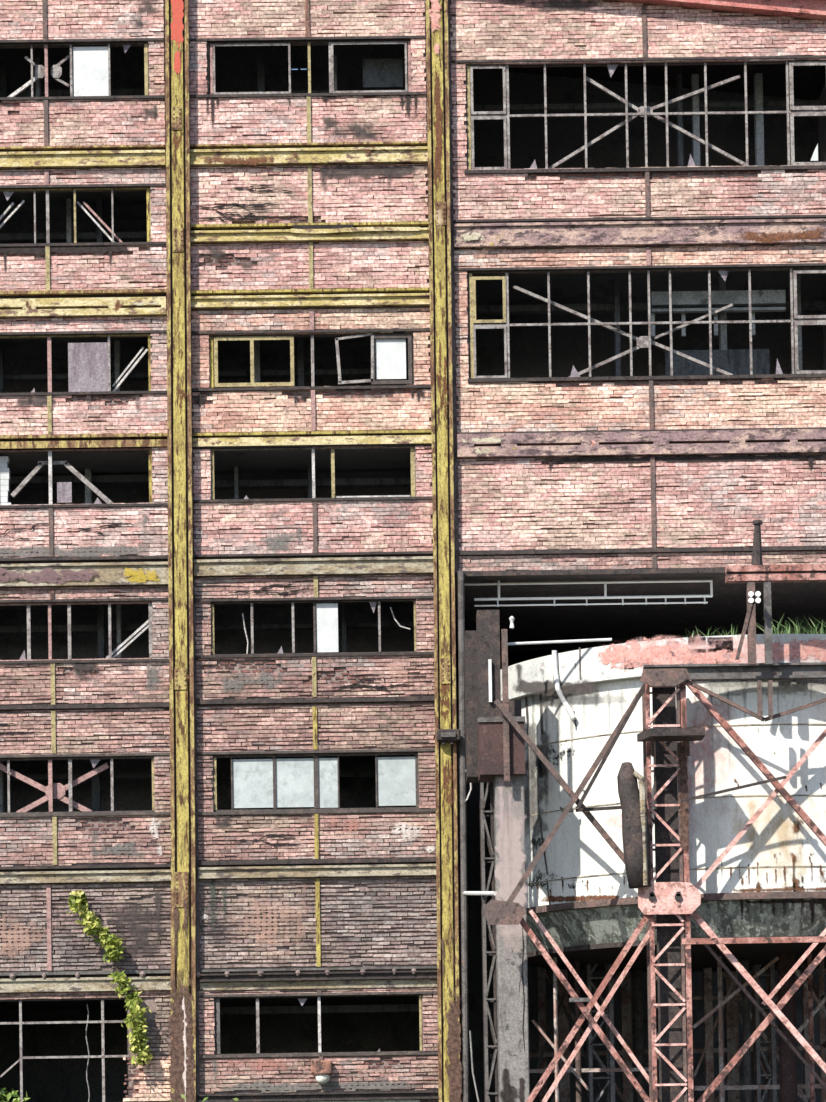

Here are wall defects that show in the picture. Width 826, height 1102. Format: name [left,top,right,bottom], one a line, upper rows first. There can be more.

peeling [171,0,184,74]
damp [321,165,415,188]
corrosion [738,227,826,243]
peeling [0,567,99,584]
peeling [123,567,160,583]
peeling [597,637,744,671]
peeling [763,639,826,663]
damp [526,724,577,816]
corrosion [721,819,826,892]
damp [526,869,589,897]
damp [740,899,826,924]
damp [500,1068,525,1102]